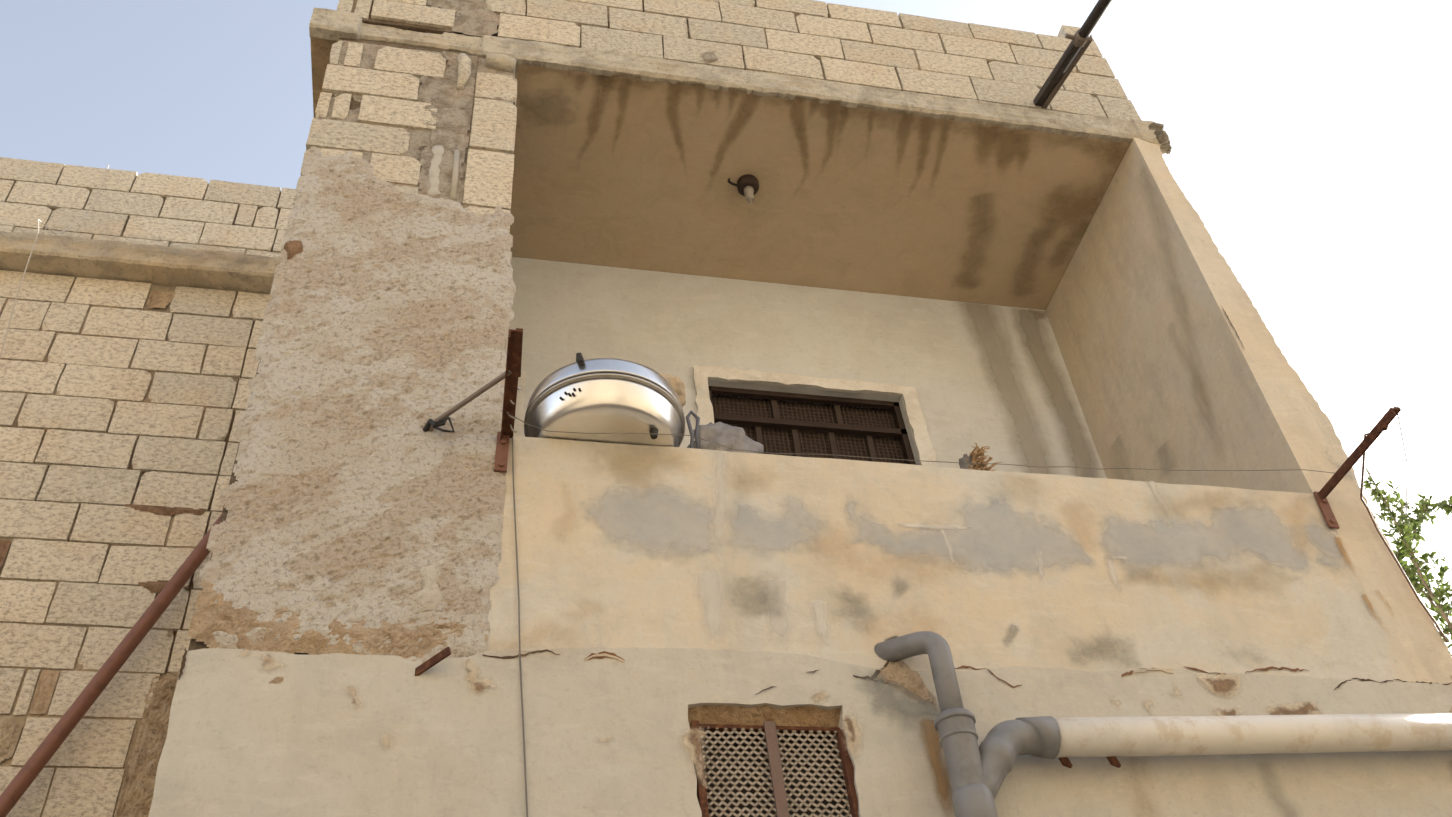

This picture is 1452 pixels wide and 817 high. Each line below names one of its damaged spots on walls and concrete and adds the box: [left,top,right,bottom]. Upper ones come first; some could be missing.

water stain [962,196,1047,474]
flaking render [125,147,516,692]
flaking render [876,660,938,711]
flaking render [1199,674,1240,716]
crack [1121,666,1452,690]
flaking render [1267,703,1320,715]
peeling [114,670,180,817]